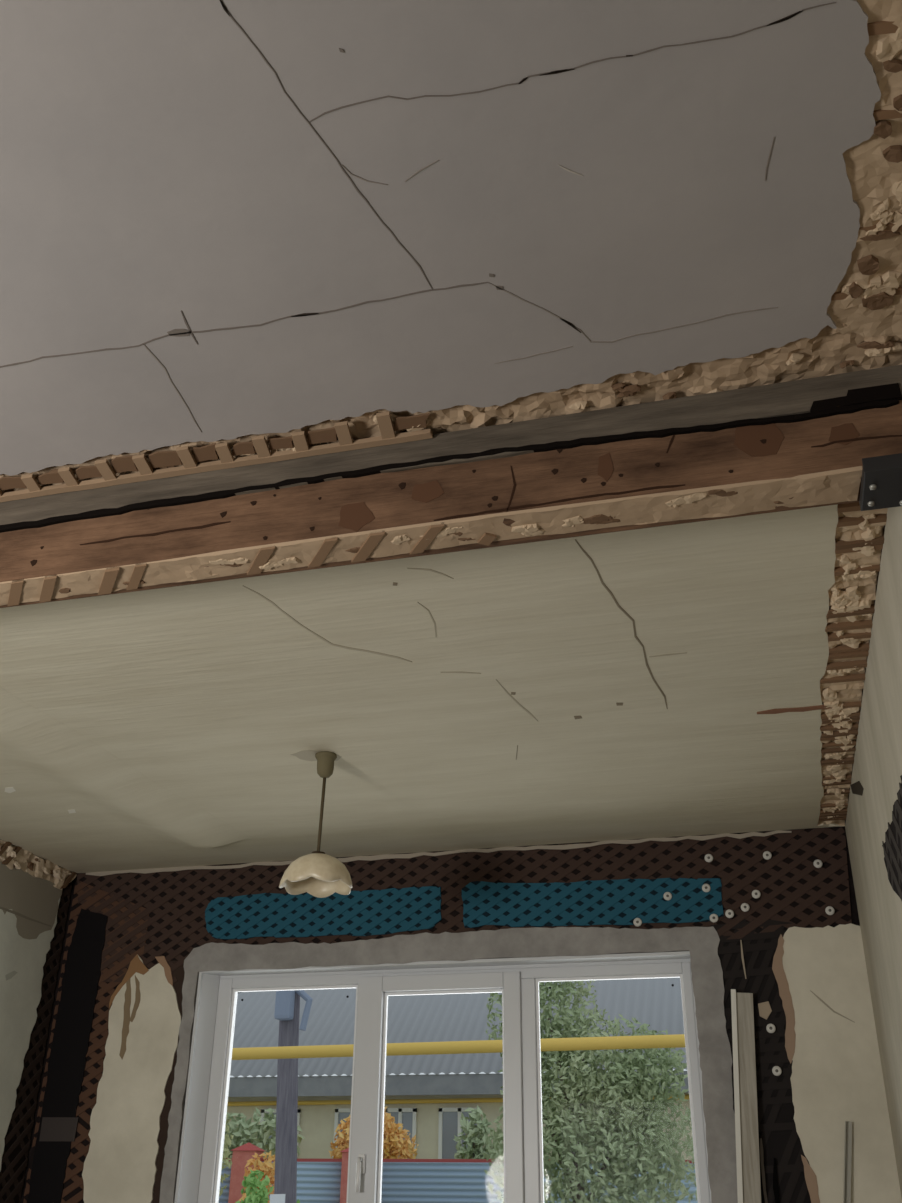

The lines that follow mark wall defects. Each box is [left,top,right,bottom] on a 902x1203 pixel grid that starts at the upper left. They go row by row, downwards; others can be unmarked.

crack [0,0,836,432]
spalling [0,0,902,502]
crack [434,466,685,521]
crack [243,586,412,662]
crack [417,602,436,635]
crack [441,672,538,721]
crack [575,539,687,709]
spalling [817,502,888,826]
peeling [205,886,442,940]
peeling [461,878,724,928]
spalling [772,934,796,1063]
spalling [152,1037,179,1203]